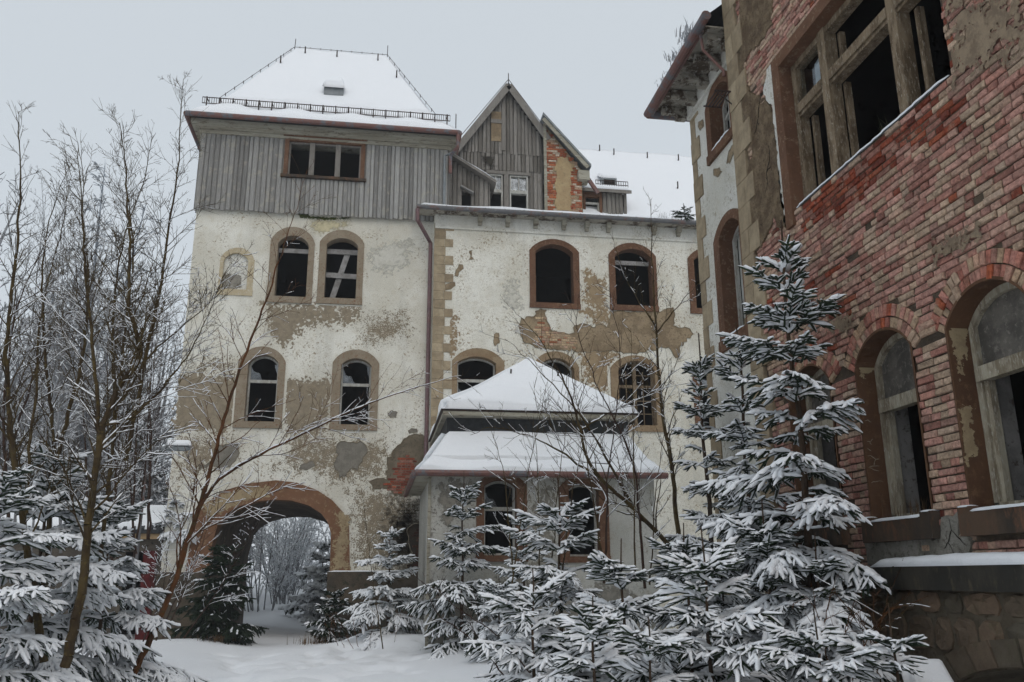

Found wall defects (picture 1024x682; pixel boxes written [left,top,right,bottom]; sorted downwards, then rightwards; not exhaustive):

peeling [256,300,420,357]
flaking render [518,264,693,392]
peeling [949,328,968,382]
peeling [166,344,424,571]
peeling [958,404,979,467]